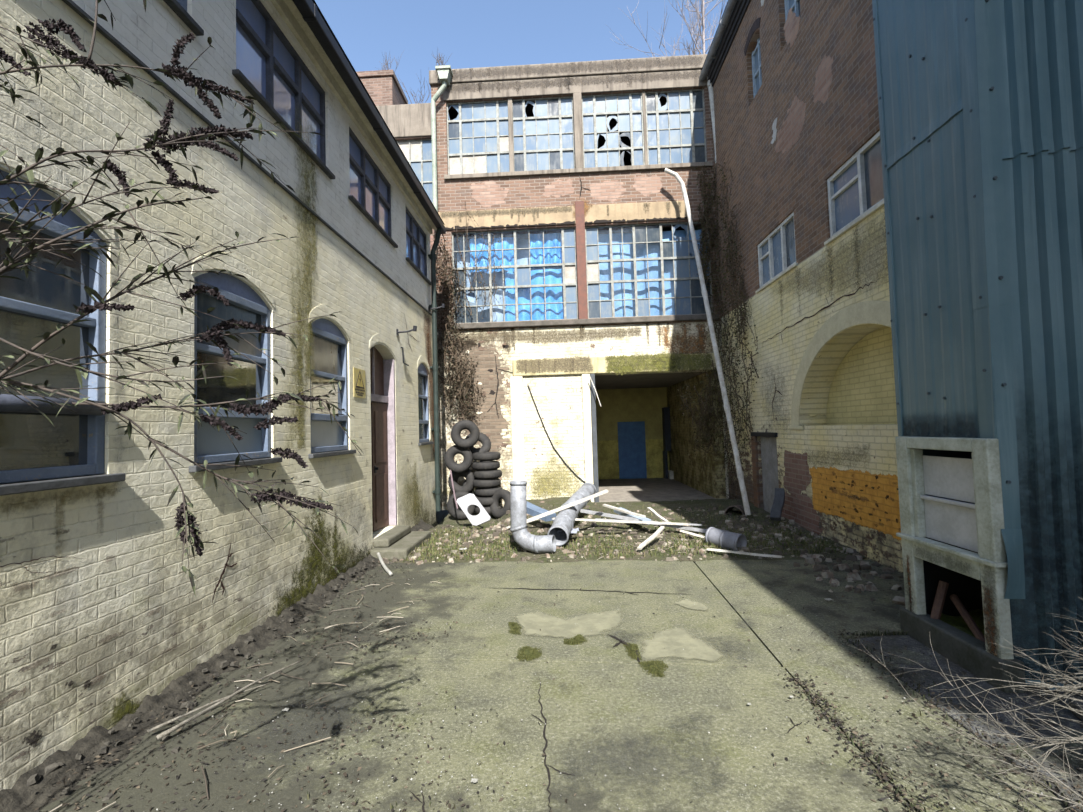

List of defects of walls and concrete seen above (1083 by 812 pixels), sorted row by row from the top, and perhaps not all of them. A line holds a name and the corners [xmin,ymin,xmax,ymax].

leakage [298,296,314,447]
leakage [456,323,669,373]
peeling [781,450,901,541]
crack [532,679,576,812]